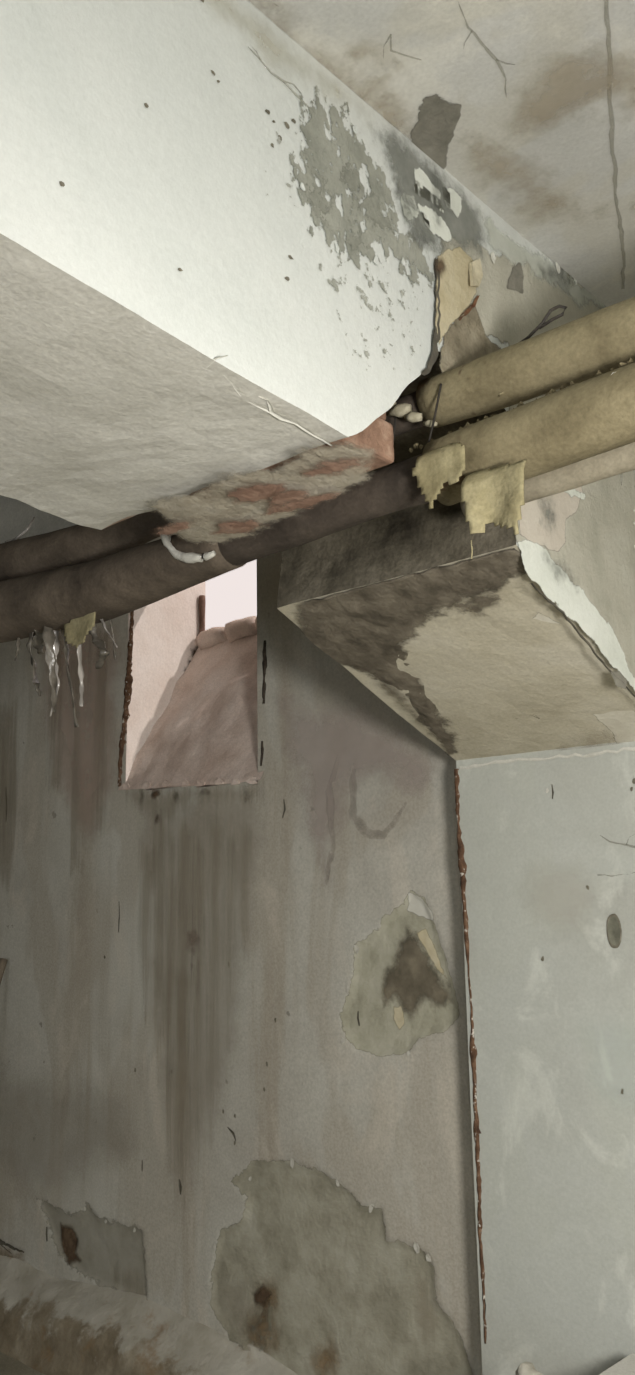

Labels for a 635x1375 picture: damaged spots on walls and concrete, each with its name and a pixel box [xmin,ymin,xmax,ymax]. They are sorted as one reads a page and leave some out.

peeling [265,85,606,376]
spalling [153,385,394,563]
spalling [298,470,635,756]
peeling [340,890,460,1057]
rust [454,769,487,1343]
peeling [36,1199,147,1296]
peeling [210,1158,472,1375]